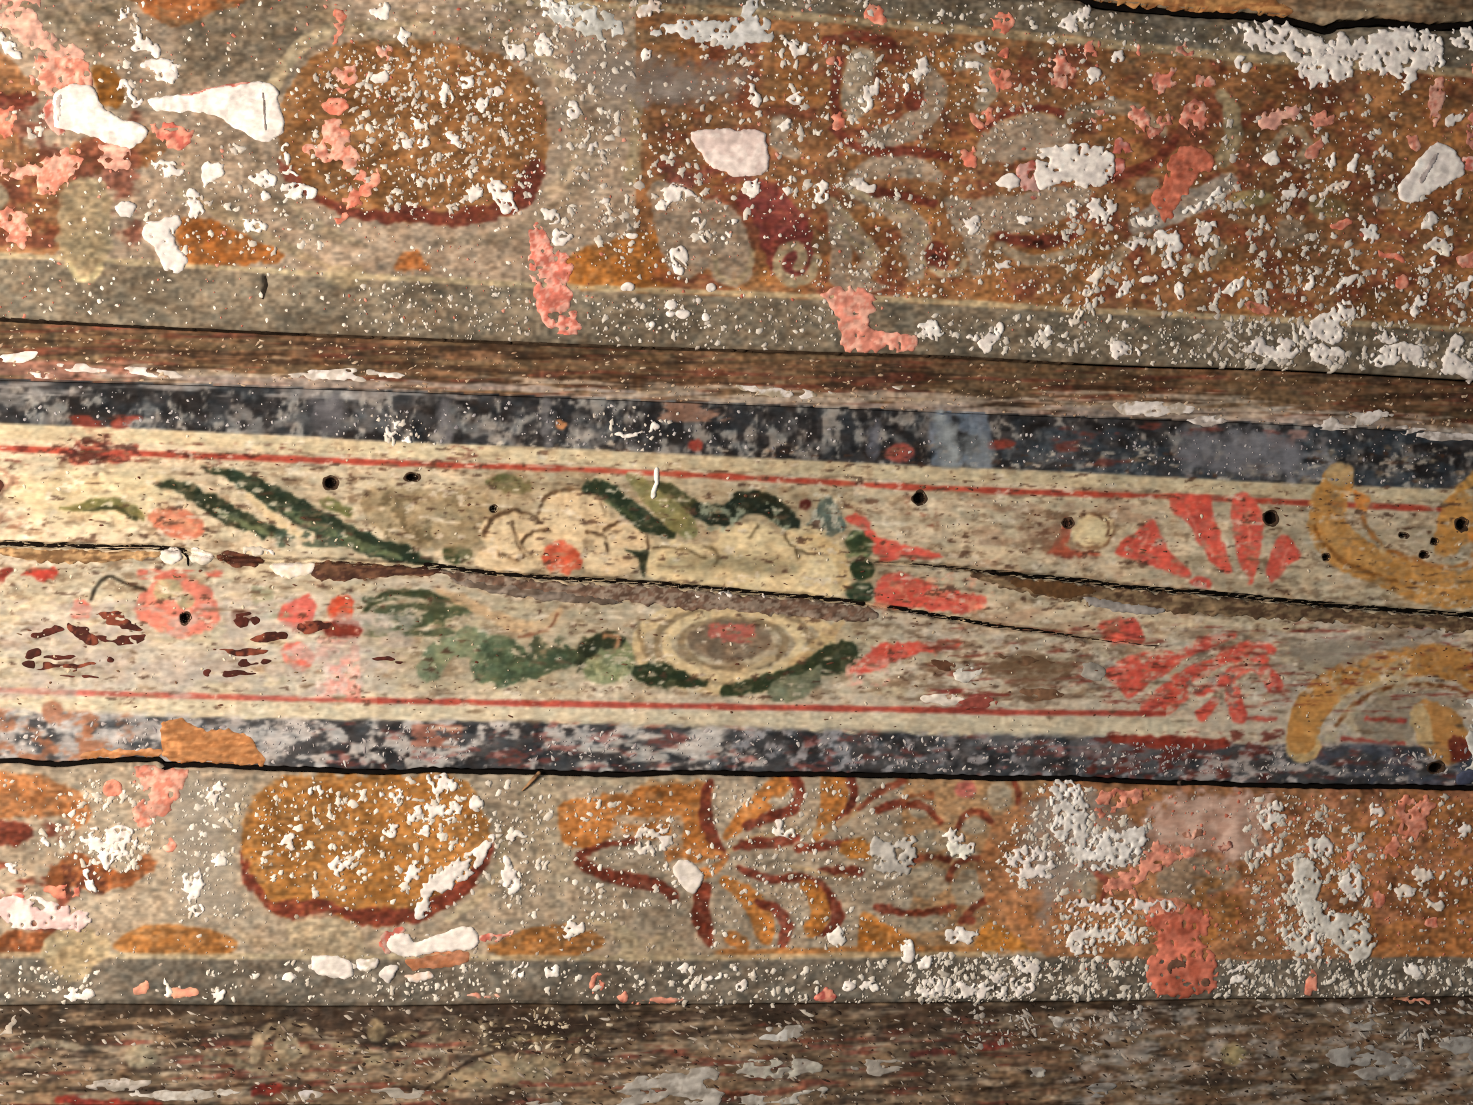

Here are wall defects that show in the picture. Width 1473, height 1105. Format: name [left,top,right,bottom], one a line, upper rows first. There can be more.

crack [1079,0,1473,34]
spalling [0,0,1473,384]
crack [0,540,189,566]
crack [423,562,1159,646]
crack [875,561,1473,617]
peeling [203,612,334,677]
peeling [920,659,998,708]
crack [0,757,1473,790]
peeling [0,699,1473,1080]
peeling [86,1078,240,1101]
peeling [371,1088,434,1099]
peeling [613,1059,828,1105]